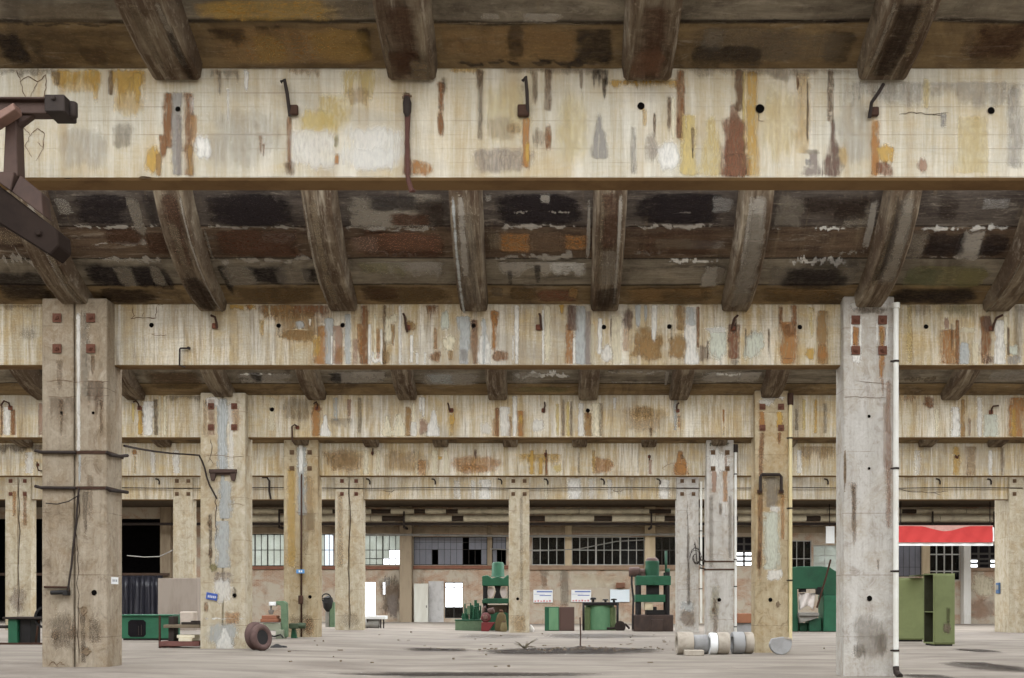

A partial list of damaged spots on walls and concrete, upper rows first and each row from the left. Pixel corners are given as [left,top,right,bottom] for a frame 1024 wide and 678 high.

corrosion [533,69,552,110]
corrosion [146,92,196,176]
corrosion [523,118,551,167]
corrosion [721,70,749,177]
corrosion [871,121,894,176]
corrosion [674,451,689,475]